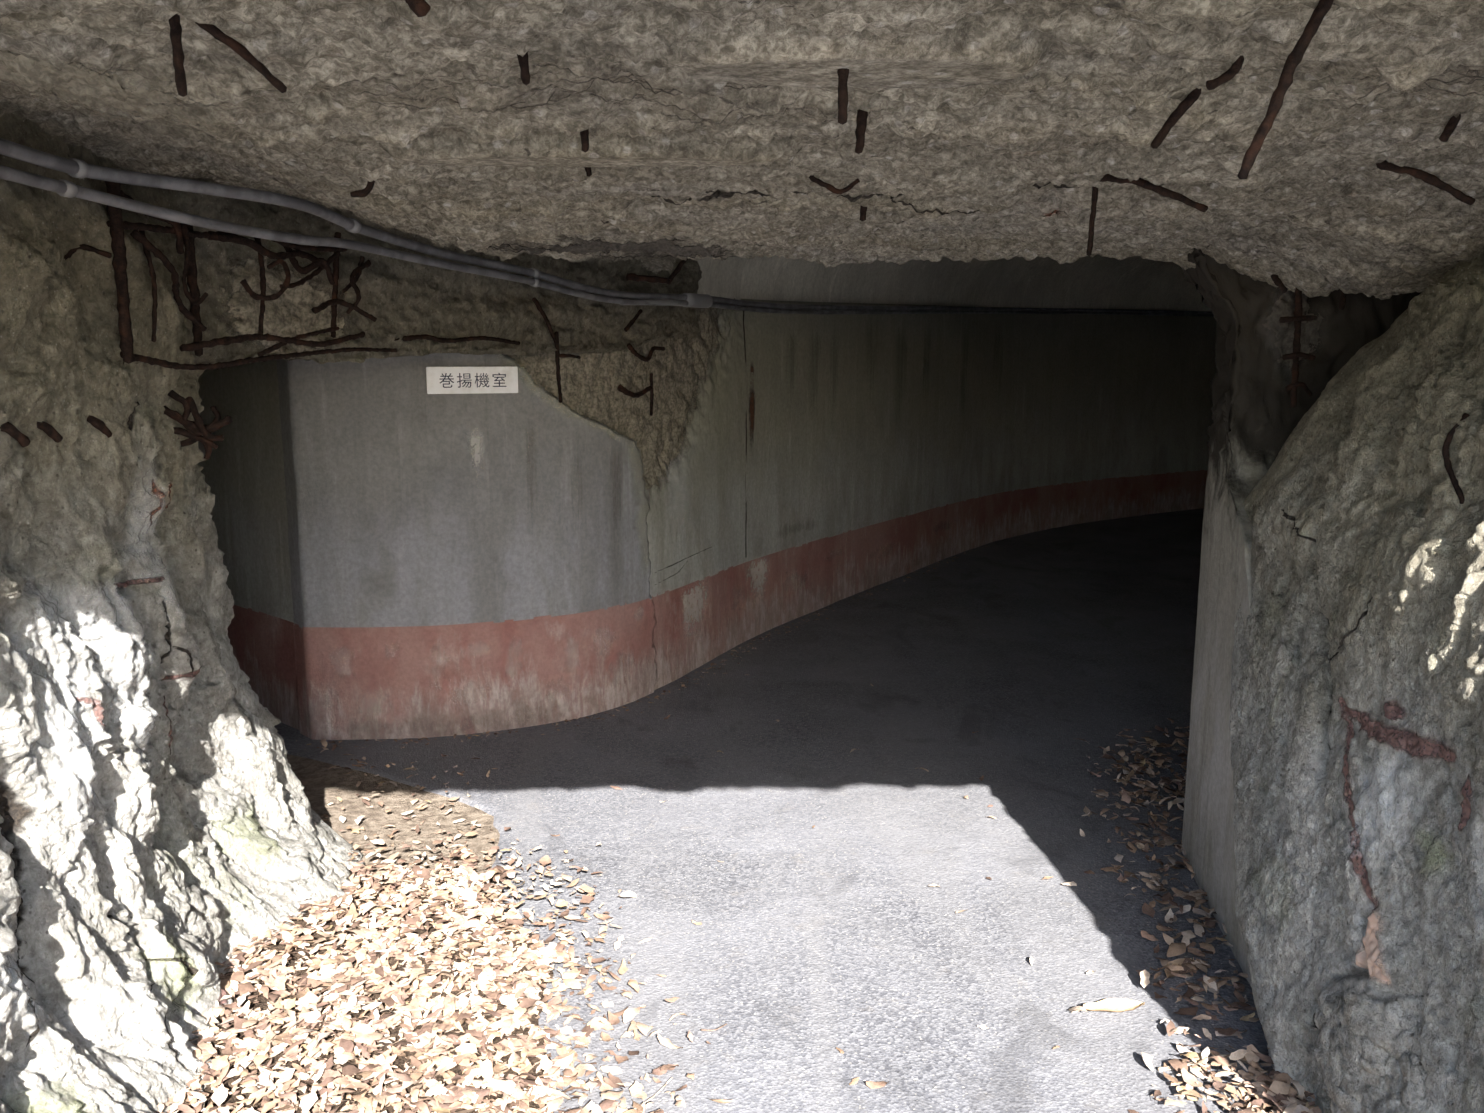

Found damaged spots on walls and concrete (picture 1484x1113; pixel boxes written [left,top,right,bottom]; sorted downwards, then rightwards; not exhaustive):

rust [169,14,287,97]
rust [837,68,868,154]
rust [1150,55,1244,149]
rust [1237,0,1334,180]
spalling [488,236,729,260]
rust [1086,174,1208,256]
rust [1376,160,1475,205]
spalling [216,256,357,361]
spalling [1259,274,1347,408]
spalling [506,307,721,490]
rust [1338,697,1456,981]
crack [0,783,40,1048]